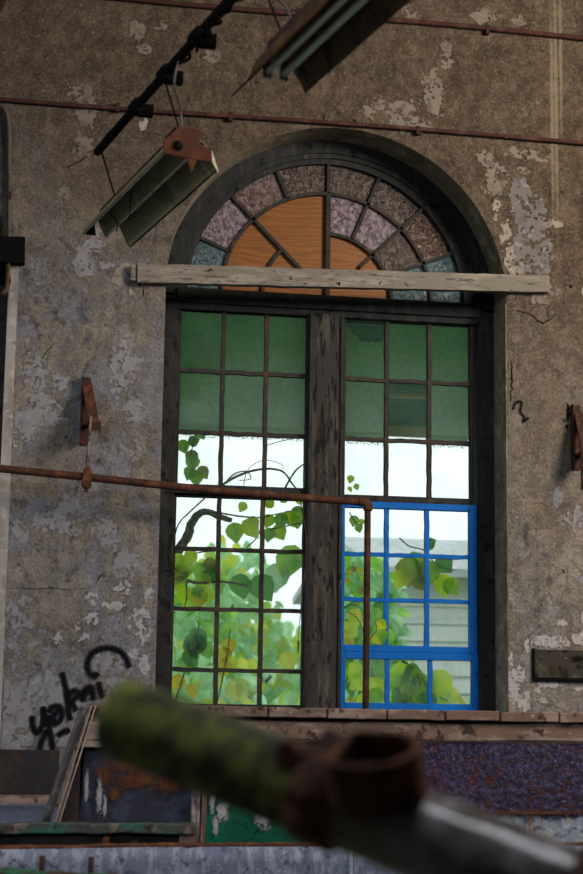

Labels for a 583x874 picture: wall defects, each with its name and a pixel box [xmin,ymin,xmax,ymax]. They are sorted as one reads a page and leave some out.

peeling [353,36,454,139]
peeling [71,228,137,296]
peeling [476,146,583,305]
crack [515,303,556,324]
peeling [13,345,71,447]
peeling [109,324,152,463]
peeling [553,486,583,533]
peeling [1,640,97,750]
peeling [6,484,156,689]
peeling [508,644,559,712]
peeling [524,612,583,653]
corrosion [94,755,177,800]